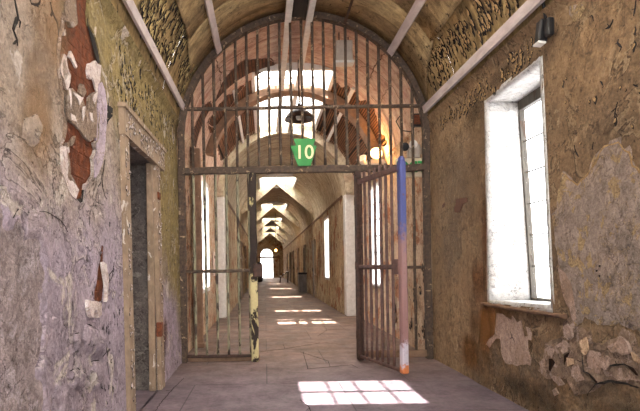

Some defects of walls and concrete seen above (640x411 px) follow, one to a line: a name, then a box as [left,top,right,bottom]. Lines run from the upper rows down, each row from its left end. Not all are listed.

flaking render [56,0,119,209]
peeling [140,0,197,96]
peeling [427,0,519,91]
peeling [439,37,533,130]
flaking render [85,239,133,318]
peeling [538,137,640,396]
peeling [486,313,532,366]
crack [577,356,639,396]